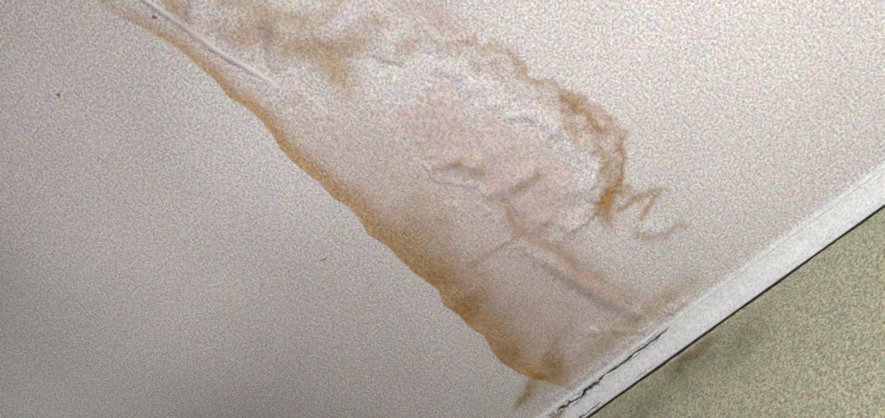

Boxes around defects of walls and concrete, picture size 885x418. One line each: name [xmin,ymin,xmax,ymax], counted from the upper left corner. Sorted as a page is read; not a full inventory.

peeling [228,74,355,175]
damp [203,67,561,403]
damp [597,188,614,210]